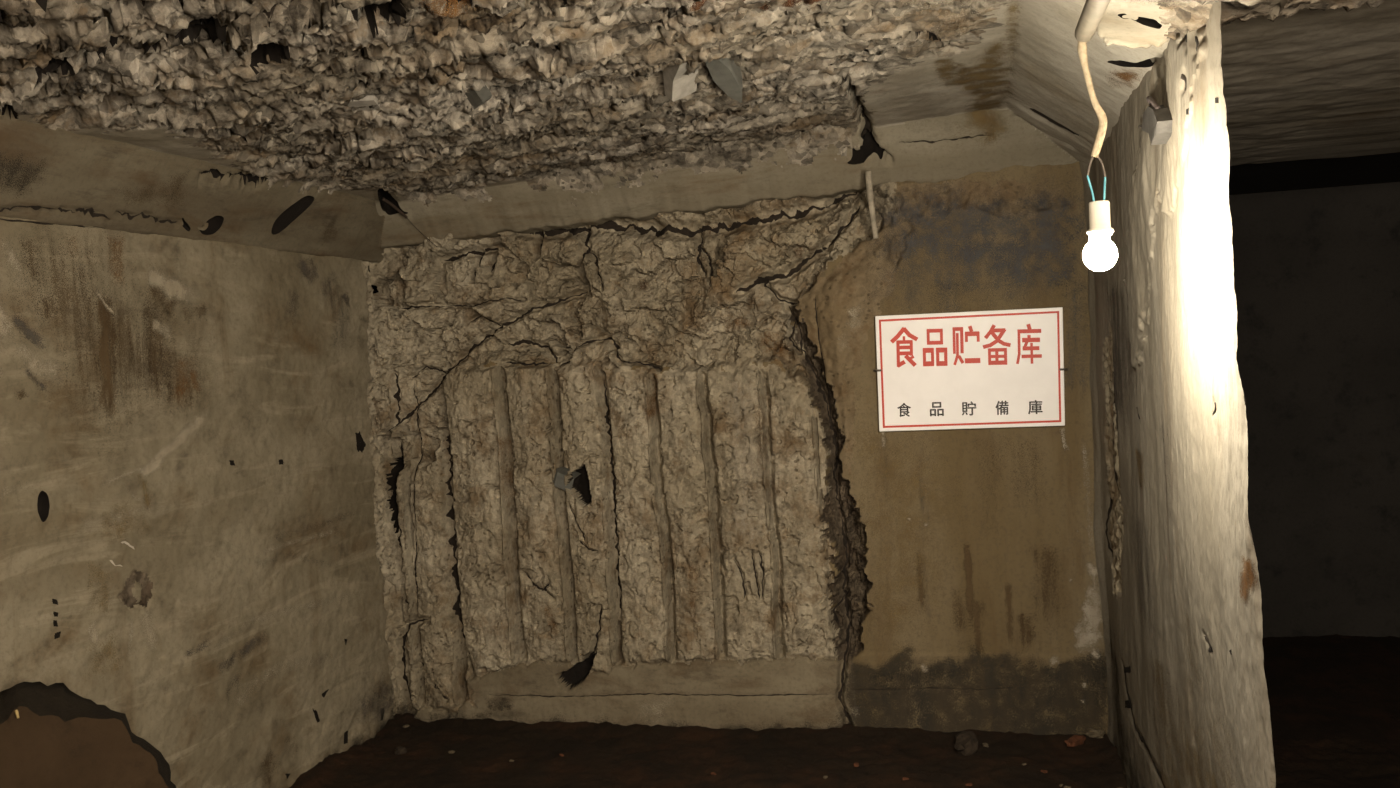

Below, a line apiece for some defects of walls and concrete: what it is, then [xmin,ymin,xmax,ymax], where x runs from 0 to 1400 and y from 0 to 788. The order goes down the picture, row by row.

crack [0,206,177,229]
spalling [0,0,1011,207]
spalling [355,182,901,720]
crack [389,192,1013,723]
leakage [324,373,1240,788]